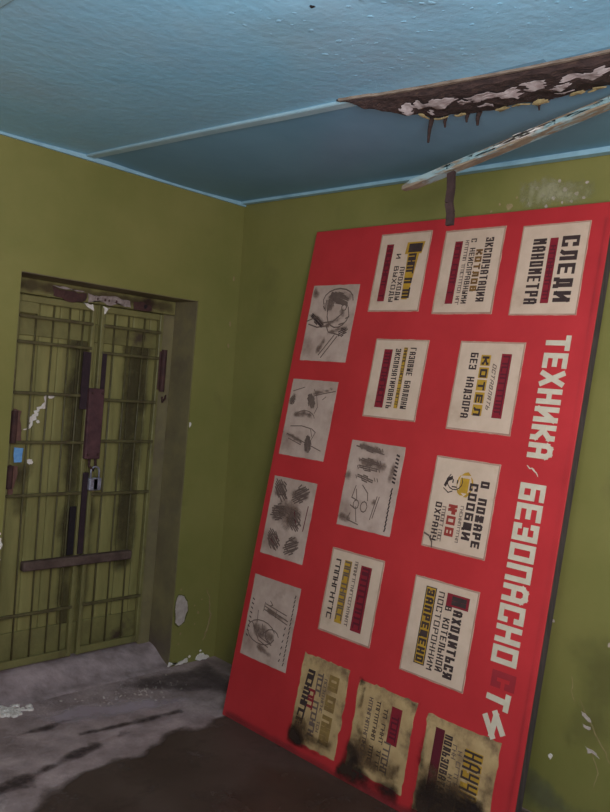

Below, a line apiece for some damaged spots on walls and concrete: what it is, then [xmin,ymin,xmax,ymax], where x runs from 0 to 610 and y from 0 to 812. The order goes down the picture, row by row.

peeling [398,65,610,120]
peeling [490,126,545,149]
peeling [23,395,55,430]
flaking render [174,594,189,627]